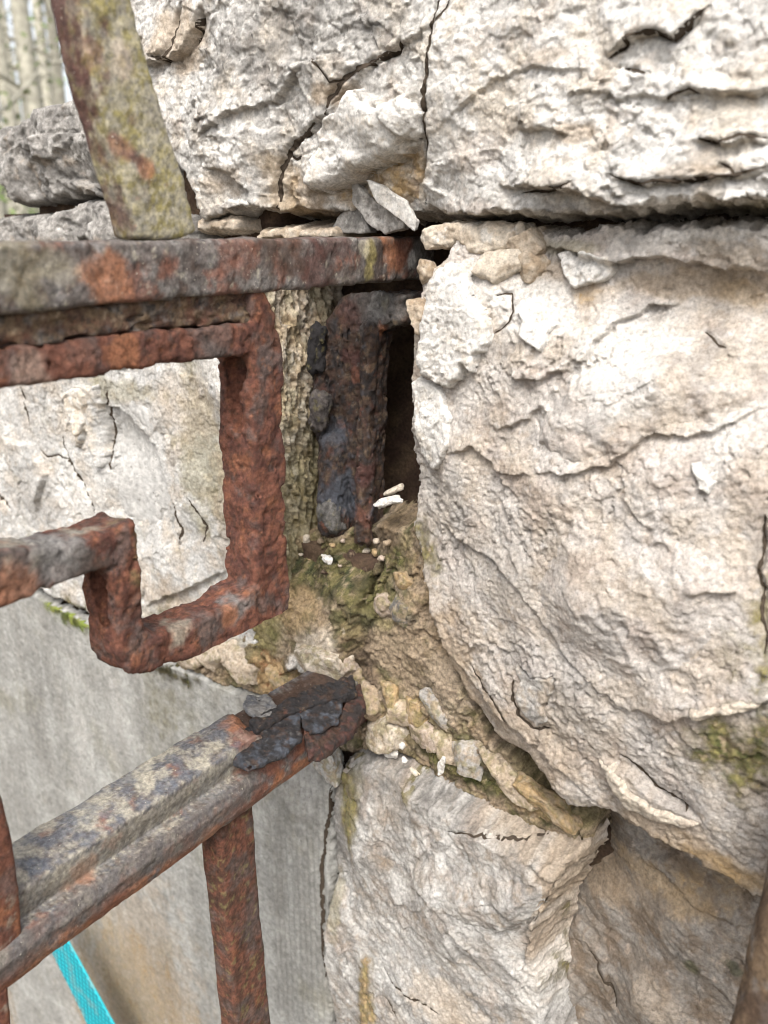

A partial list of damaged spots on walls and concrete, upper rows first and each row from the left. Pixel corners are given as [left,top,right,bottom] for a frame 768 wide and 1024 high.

crack [608,5,709,73]
crack [276,0,449,217]
rust [0,294,250,348]
crack [448,831,549,842]